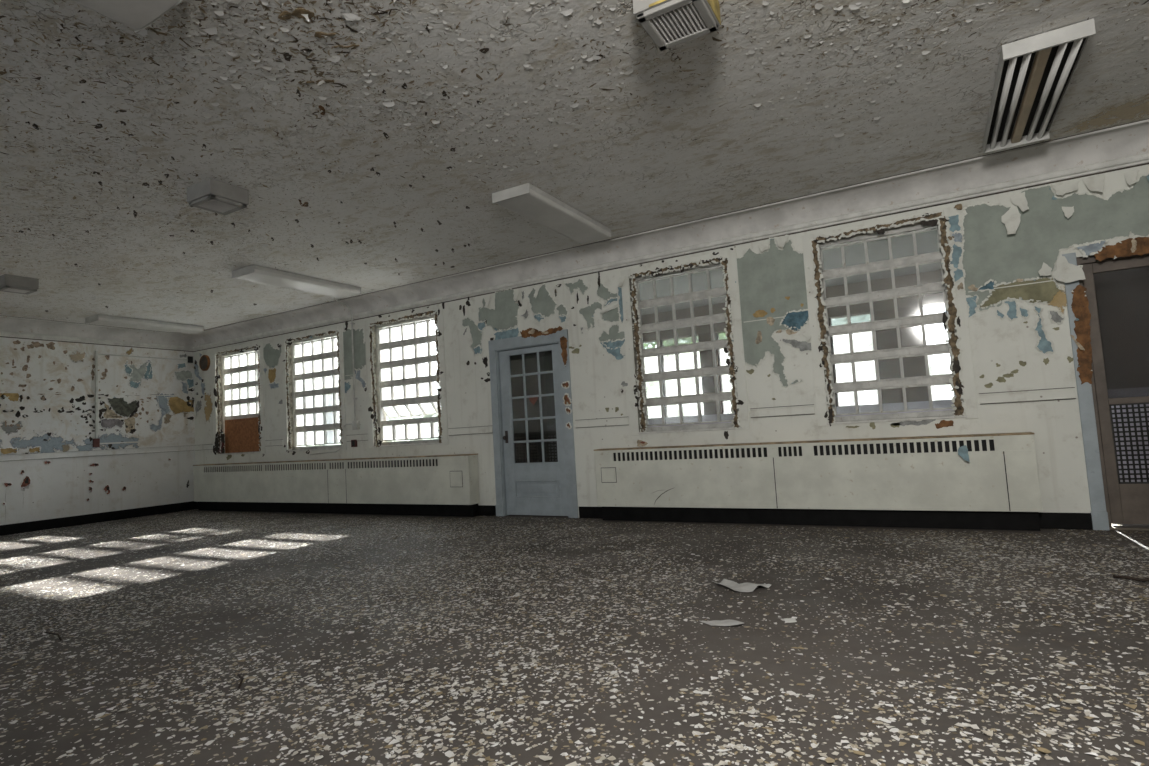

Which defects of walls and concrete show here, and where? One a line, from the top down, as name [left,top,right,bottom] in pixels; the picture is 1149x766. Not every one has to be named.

peeling [0,302,444,507]
peeling [459,169,1149,439]